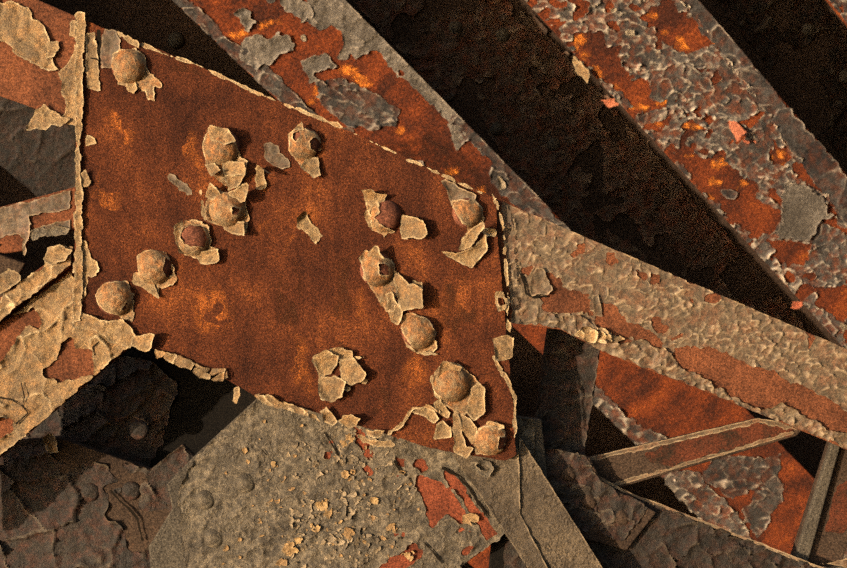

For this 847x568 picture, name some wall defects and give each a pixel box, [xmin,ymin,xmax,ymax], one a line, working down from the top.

rust [342,66,370,87]
rust [383,128,509,204]
peeling [0,1,194,568]